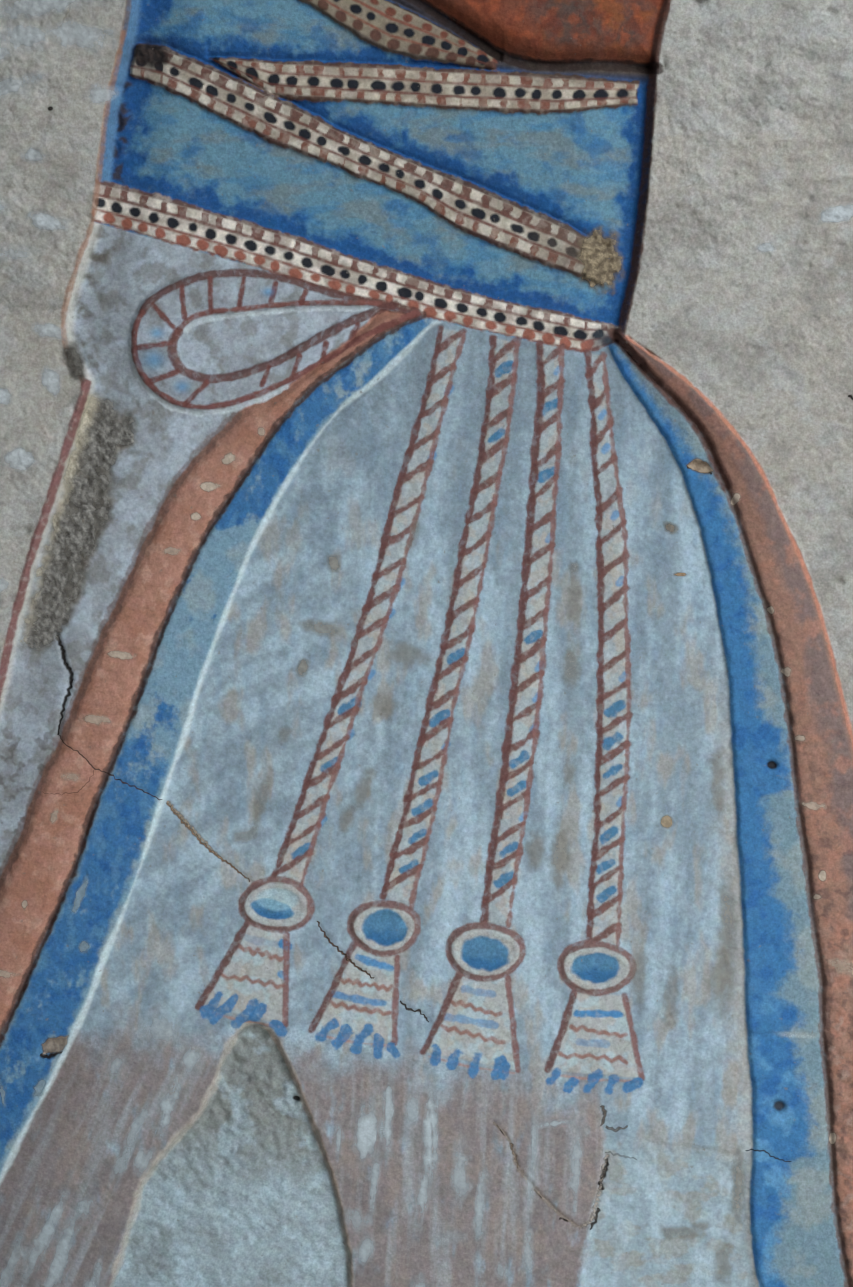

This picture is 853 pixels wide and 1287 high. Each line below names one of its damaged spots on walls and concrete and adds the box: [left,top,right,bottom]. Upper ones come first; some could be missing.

spalling [578,227,623,288]
spalling [24,397,135,649]
crack [56,635,250,882]
crack [317,921,374,978]
crack [400,1000,429,1022]
crack [496,1105,628,1230]